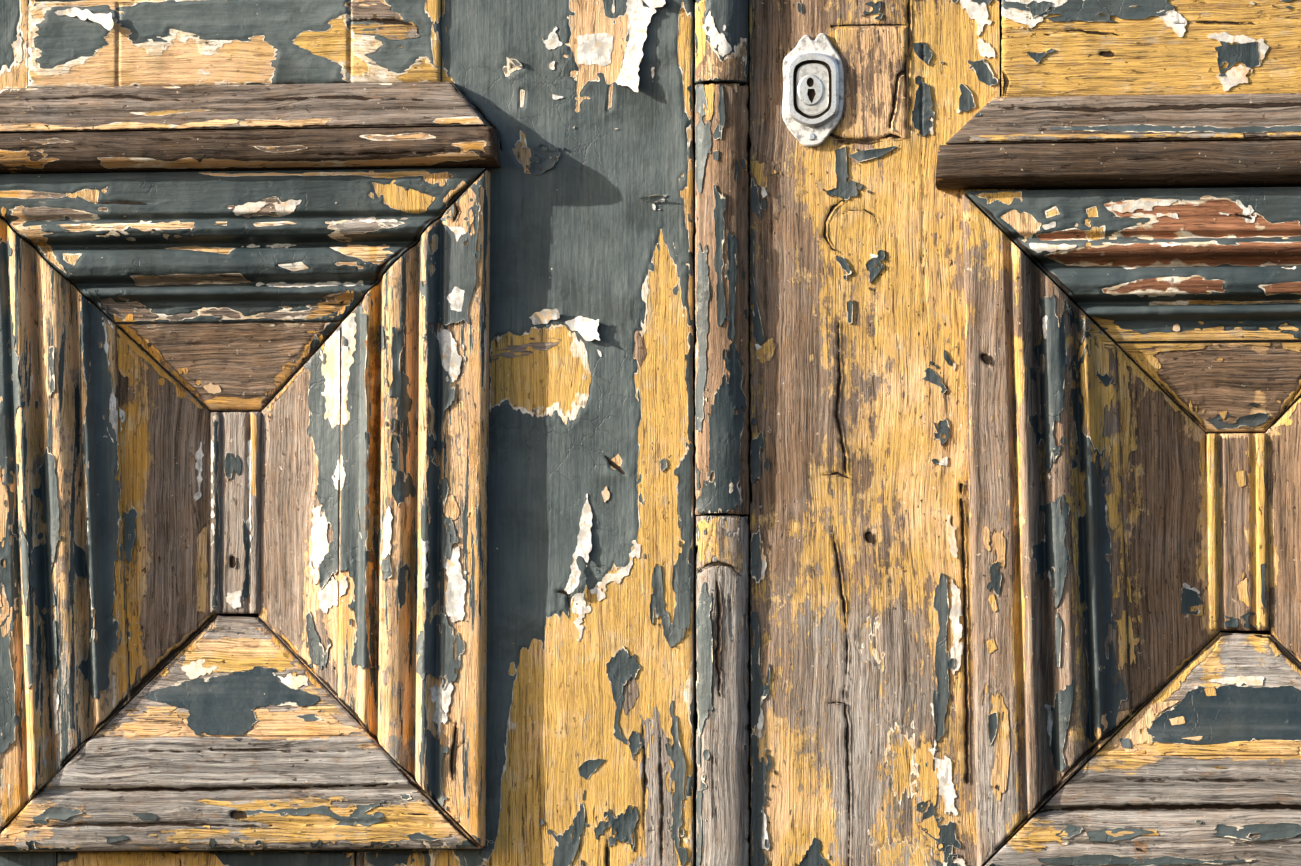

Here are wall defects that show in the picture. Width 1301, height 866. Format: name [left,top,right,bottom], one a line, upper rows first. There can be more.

peeling [912,42,944,137]
peeling [952,0,1187,117]
peeling [1206,32,1269,91]
peeling [823,129,896,202]
peeling [976,191,1301,305]
peeling [923,350,956,393]
peeling [0,0,782,866]
peeling [1029,295,1301,772]
peeling [868,573,971,866]
peeling [981,684,1015,801]
peeling [795,838,829,866]
peeling [1029,820,1301,866]